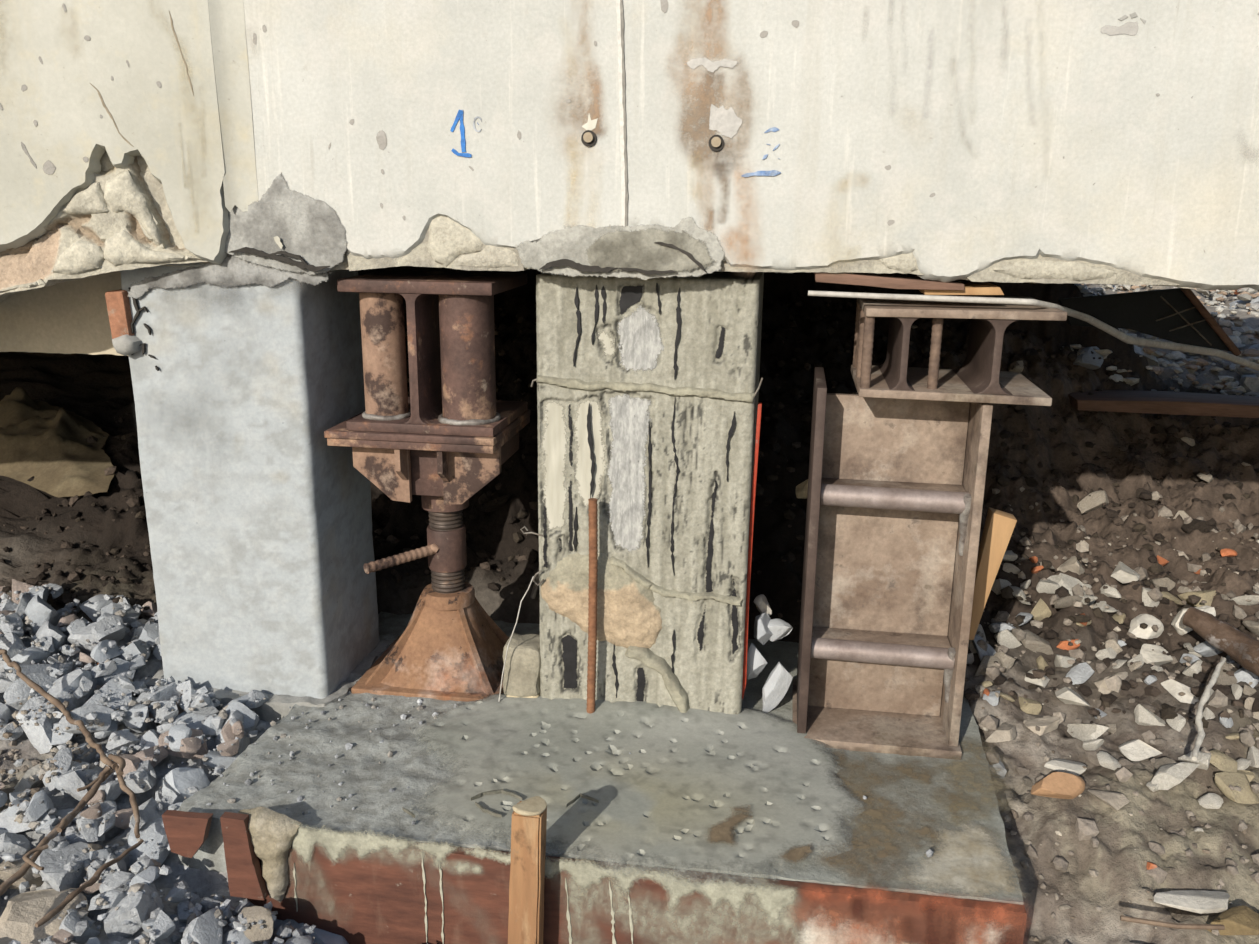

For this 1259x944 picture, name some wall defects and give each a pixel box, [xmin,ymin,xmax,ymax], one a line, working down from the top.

corrosion [570,69,602,135]
crack [616,0,628,227]
corrosion [681,0,750,191]
spalling [0,156,209,296]
spalling [347,216,528,271]
spalling [105,289,135,339]
crack [539,242,707,573]
crack [715,327,725,359]
crack [612,411,738,701]
crack [561,635,578,689]